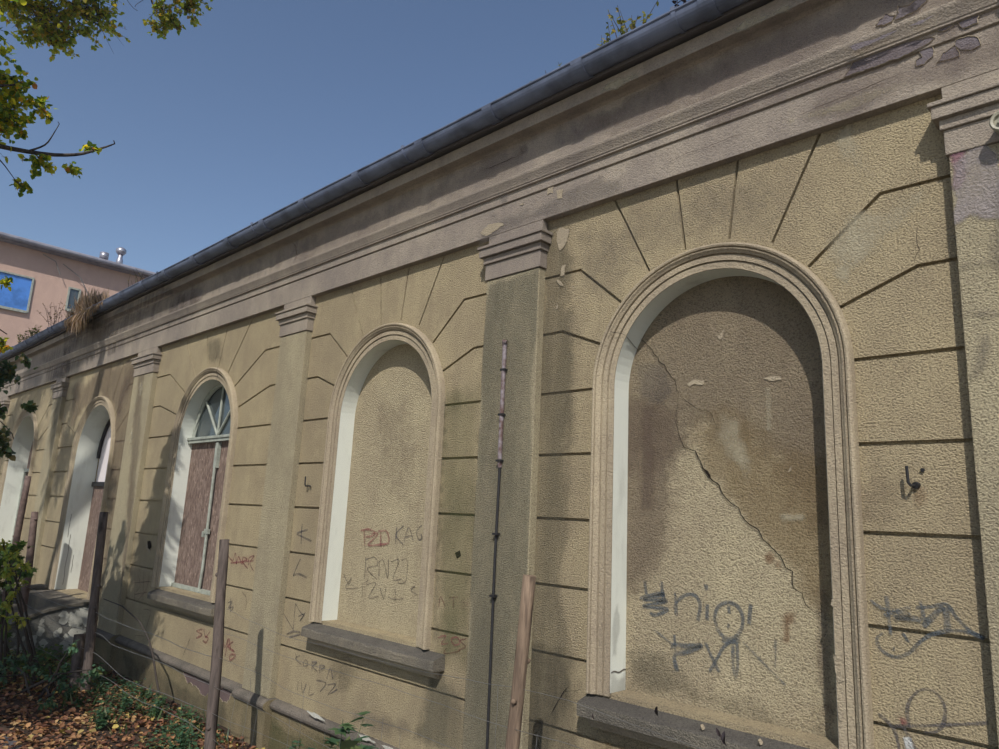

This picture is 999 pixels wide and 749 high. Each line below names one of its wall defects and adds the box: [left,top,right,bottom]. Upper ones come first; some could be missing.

peeling [843,13,982,78]
peeling [952,145,999,223]
crack [610,331,822,618]
peeling [10,607,89,656]